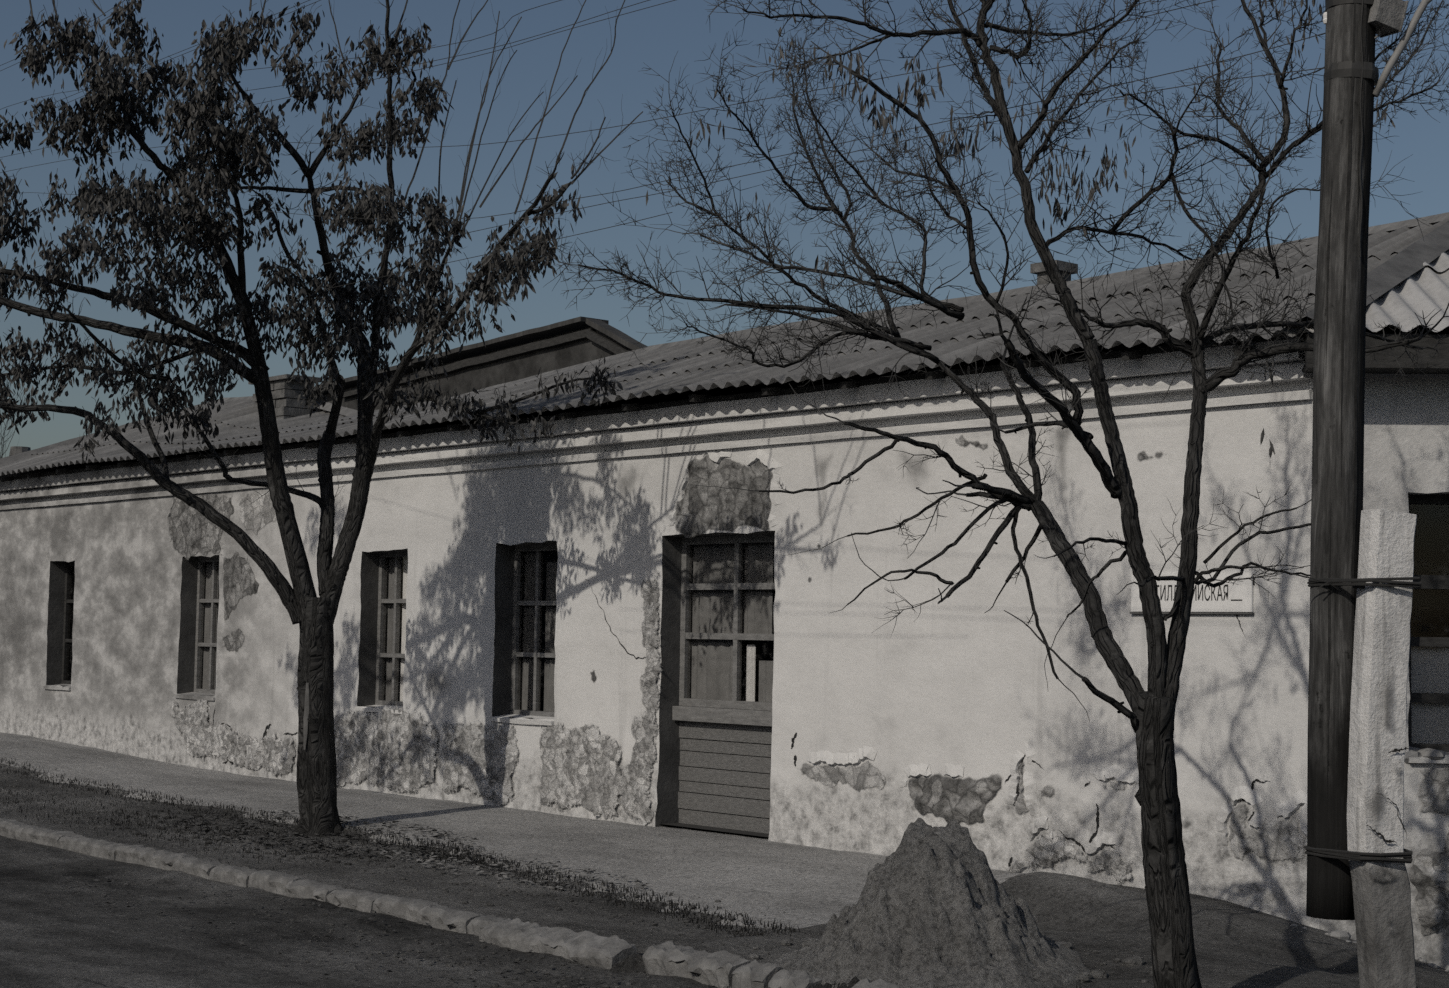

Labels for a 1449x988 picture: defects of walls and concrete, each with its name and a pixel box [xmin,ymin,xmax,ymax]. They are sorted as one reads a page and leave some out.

peeling [667,448,783,538]
flaking render [170,699,296,777]
flaking render [334,706,519,805]
flaking render [539,571,661,826]
flaking render [801,741,1139,885]
flaking render [1216,786,1307,863]
flaking render [1409,767,1449,936]